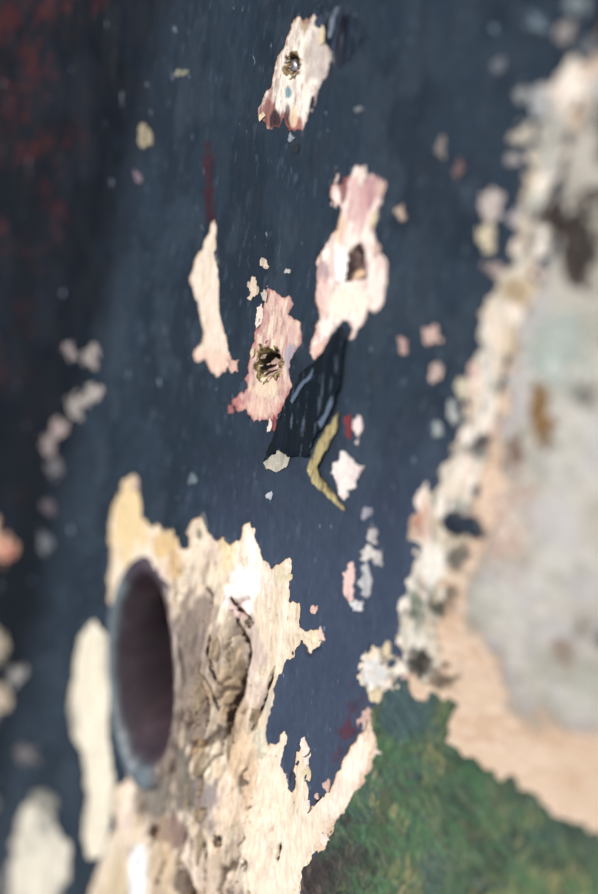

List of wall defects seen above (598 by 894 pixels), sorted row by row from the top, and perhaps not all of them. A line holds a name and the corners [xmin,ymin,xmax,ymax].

peeling [258,4,369,153]
peeling [138,123,152,149]
peeling [62,341,100,370]
peeling [190,165,387,472]
peeling [357,36,598,703]
peeling [39,532,54,556]
peeling [41,498,56,517]
peeling [38,383,104,481]
peeling [331,451,364,500]
spalling [69,474,383,894]
peeling [15,744,40,765]
peeling [0,790,71,894]